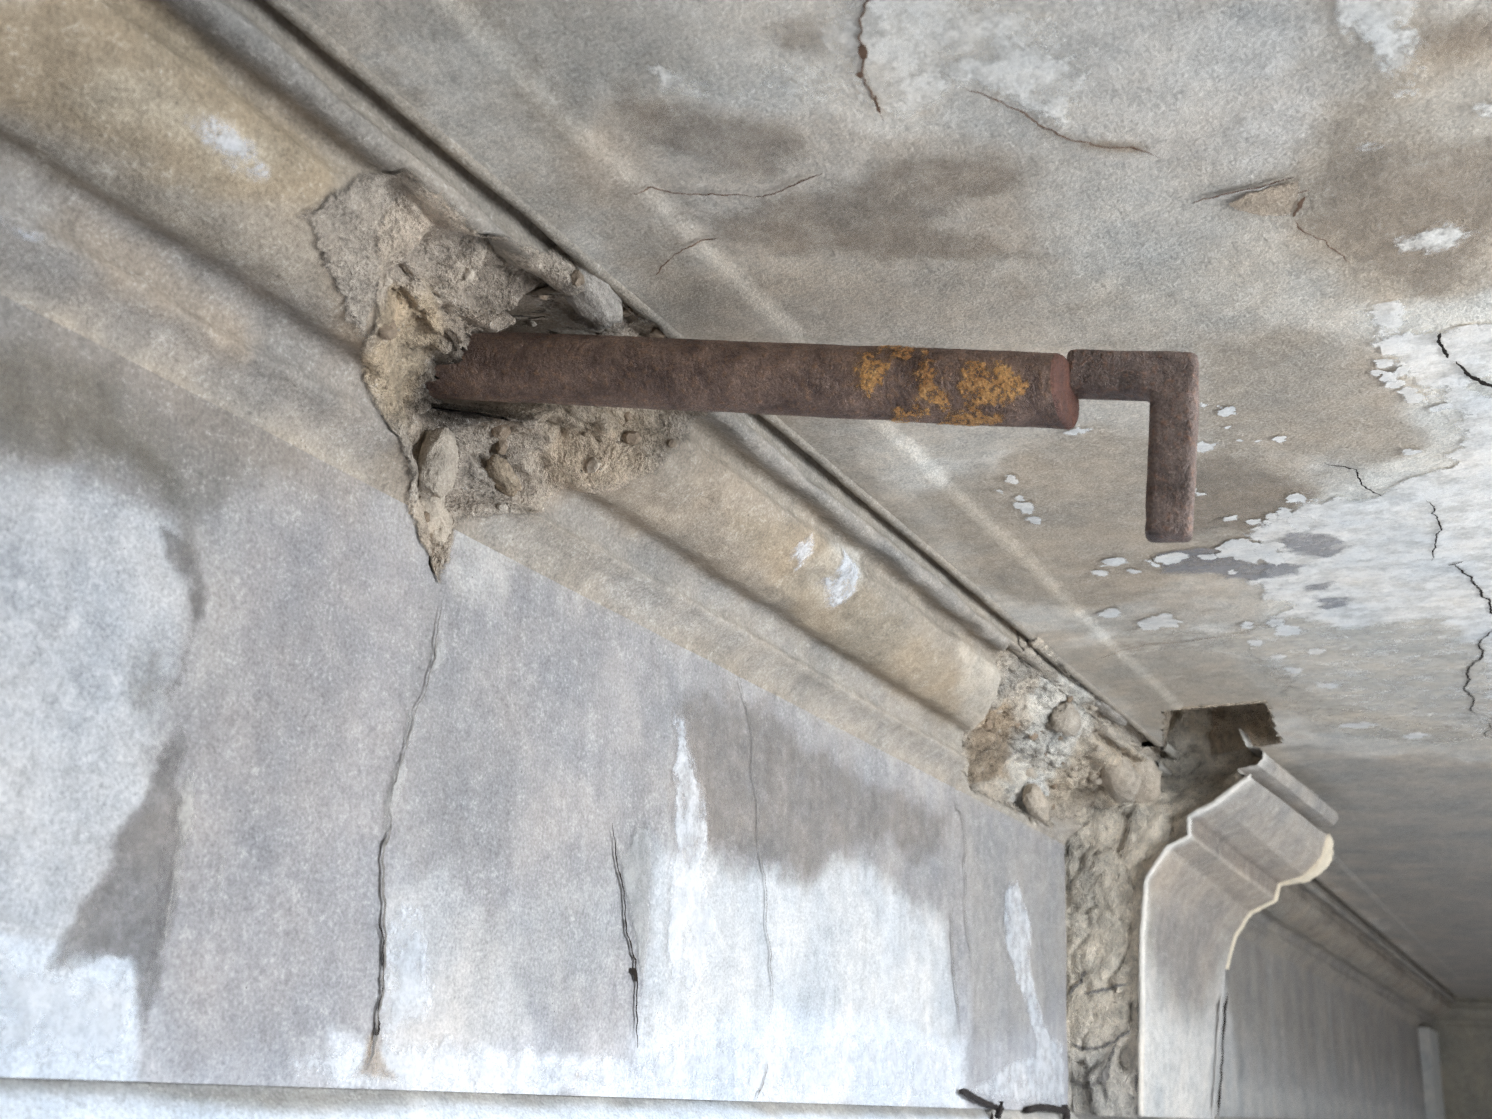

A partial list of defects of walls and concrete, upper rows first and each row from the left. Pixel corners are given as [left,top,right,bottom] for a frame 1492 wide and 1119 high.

crack [853,0,885,123]
damp [1397,226,1469,255]
spalling [300,170,708,582]
corrosion [854,345,1029,427]
peeling [1370,359,1453,412]
crack [1436,332,1492,387]
damp [165,531,204,615]
peeling [1091,493,1364,609]
crack [1426,500,1492,738]
spalling [961,632,1168,828]
damp [0,745,194,1059]
crack [612,824,638,1048]